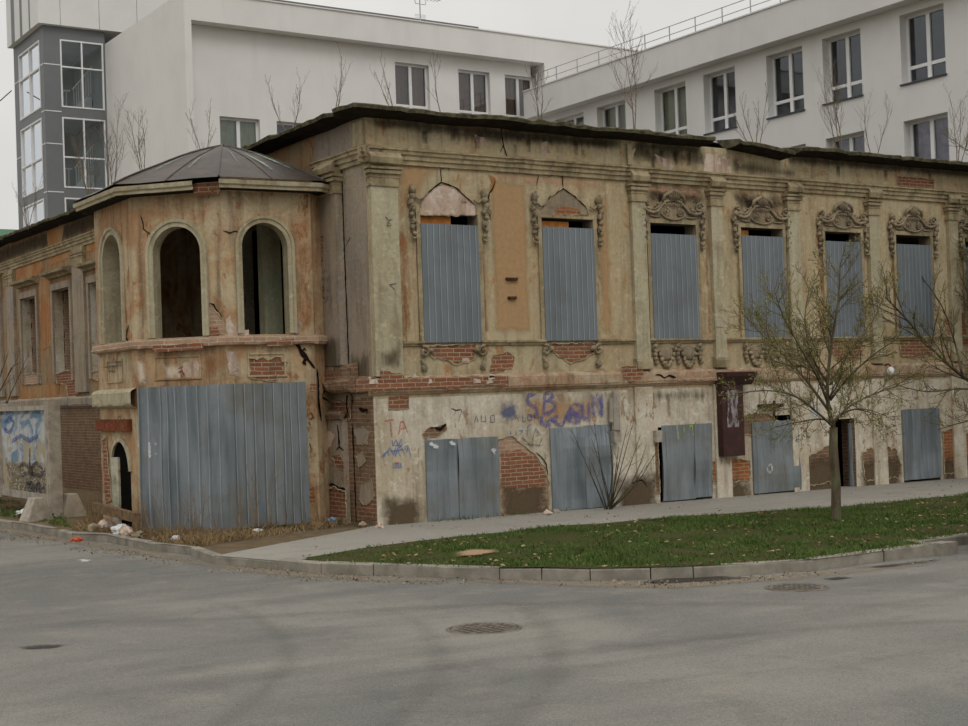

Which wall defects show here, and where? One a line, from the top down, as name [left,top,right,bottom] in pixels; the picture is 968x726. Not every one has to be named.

flaking render [153,301,249,380]
flaking render [226,319,303,382]
flaking render [426,343,477,365]
flaking render [549,342,596,364]
flaking render [327,351,515,521]
flaking render [498,435,550,515]
flaking render [732,458,751,483]
damp [809,459,831,490]
flaking render [943,428,955,475]
damp [385,499,418,525]